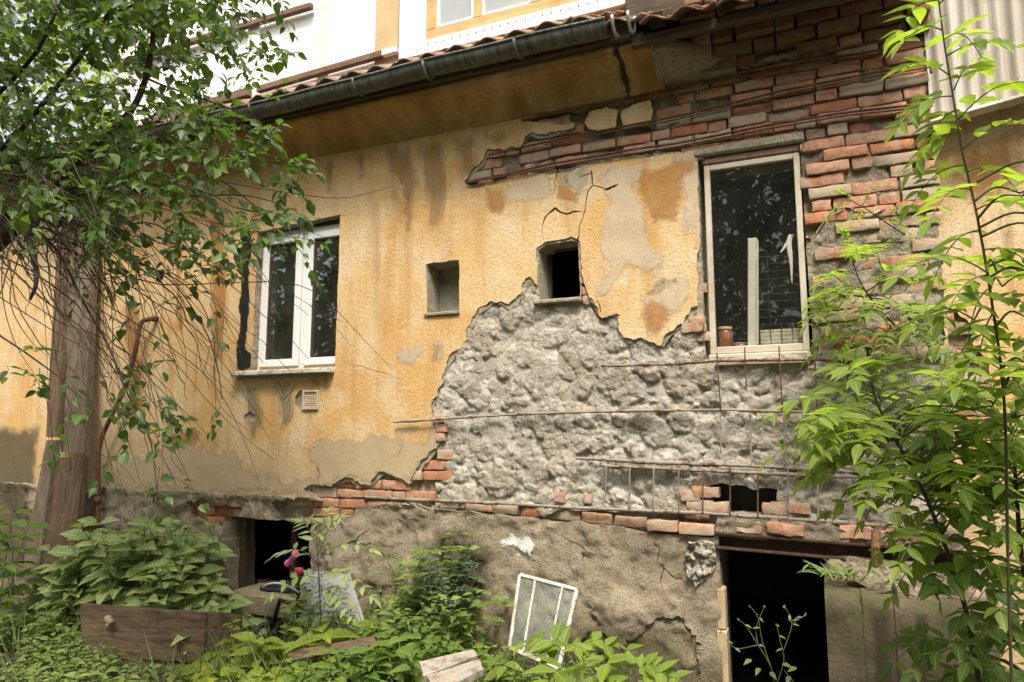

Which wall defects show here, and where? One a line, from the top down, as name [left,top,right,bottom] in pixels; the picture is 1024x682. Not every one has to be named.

crack [613,45,630,93]
crack [544,167,616,242]
flaking render [107,35,1000,536]